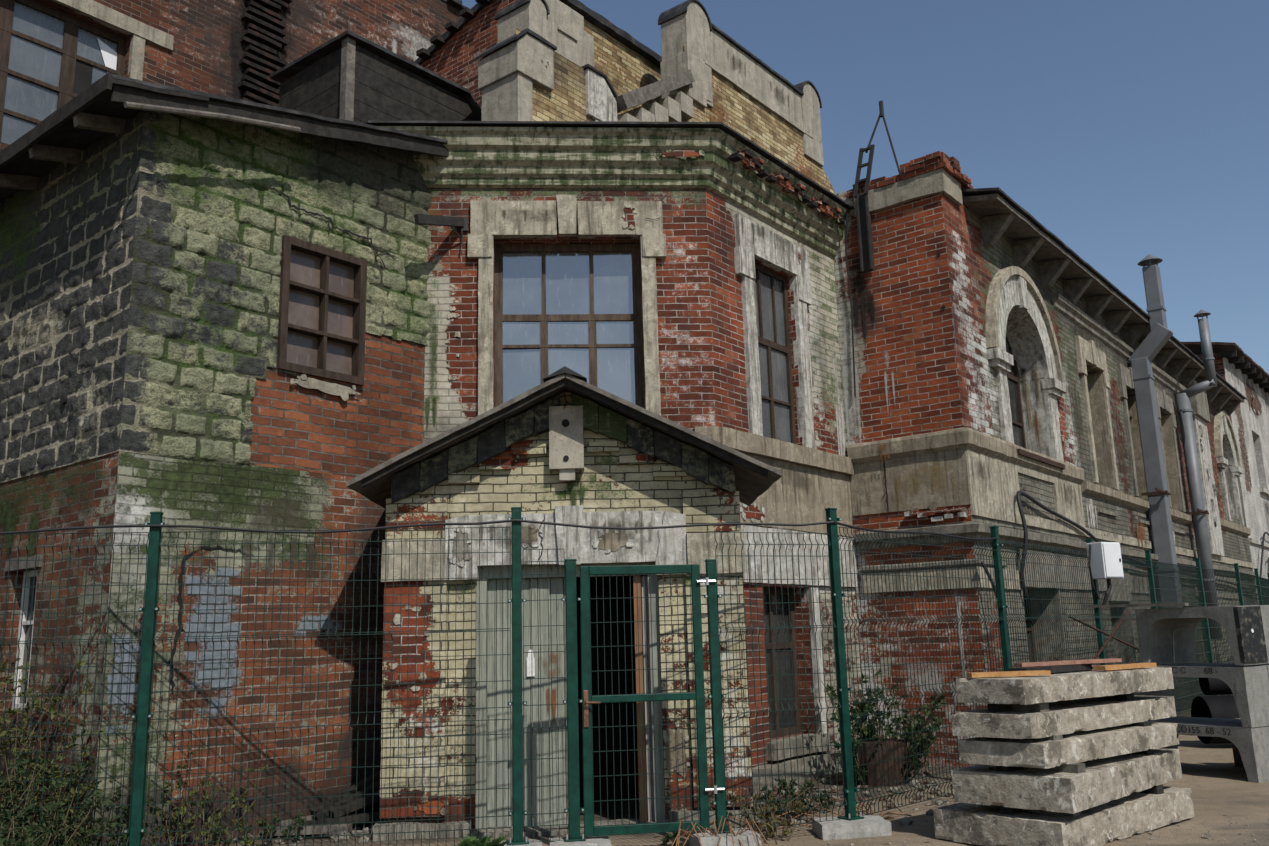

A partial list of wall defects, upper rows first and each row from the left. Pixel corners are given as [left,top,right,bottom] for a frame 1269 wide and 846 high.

peeling [445,307,461,388]
damp [834,294,875,456]
crack [168,545,254,697]
peeling [185,564,242,715]
peeling [294,615,341,640]
peeling [389,602,429,691]
flaking render [664,722,691,778]